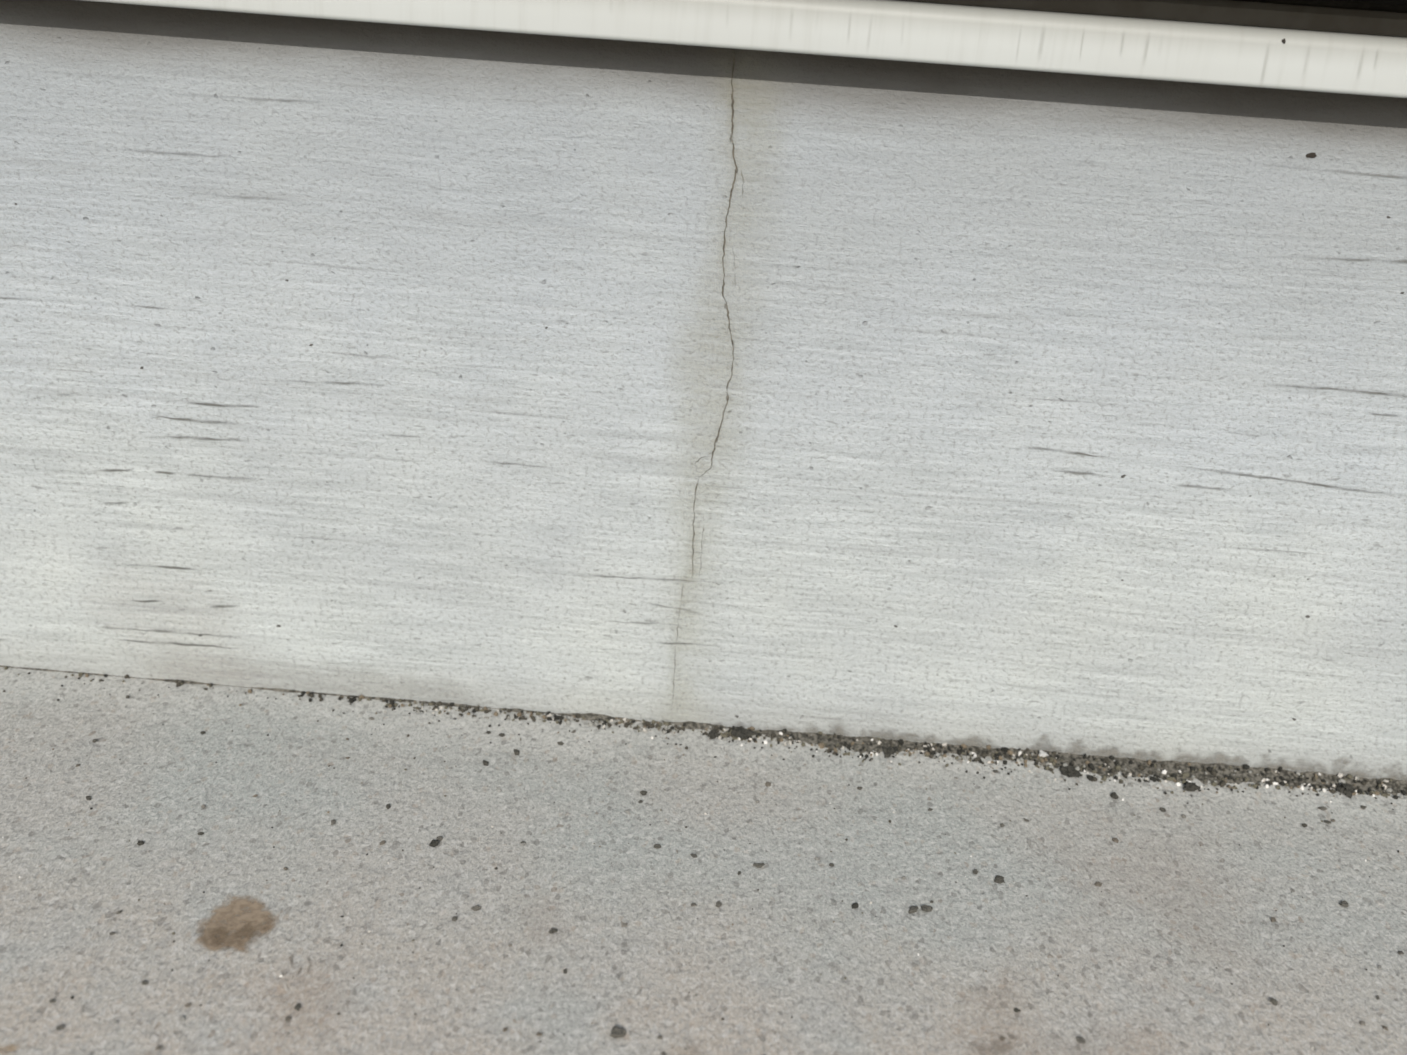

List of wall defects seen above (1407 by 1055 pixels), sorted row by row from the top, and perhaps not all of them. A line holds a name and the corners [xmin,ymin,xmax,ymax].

crack [672,49,744,703]